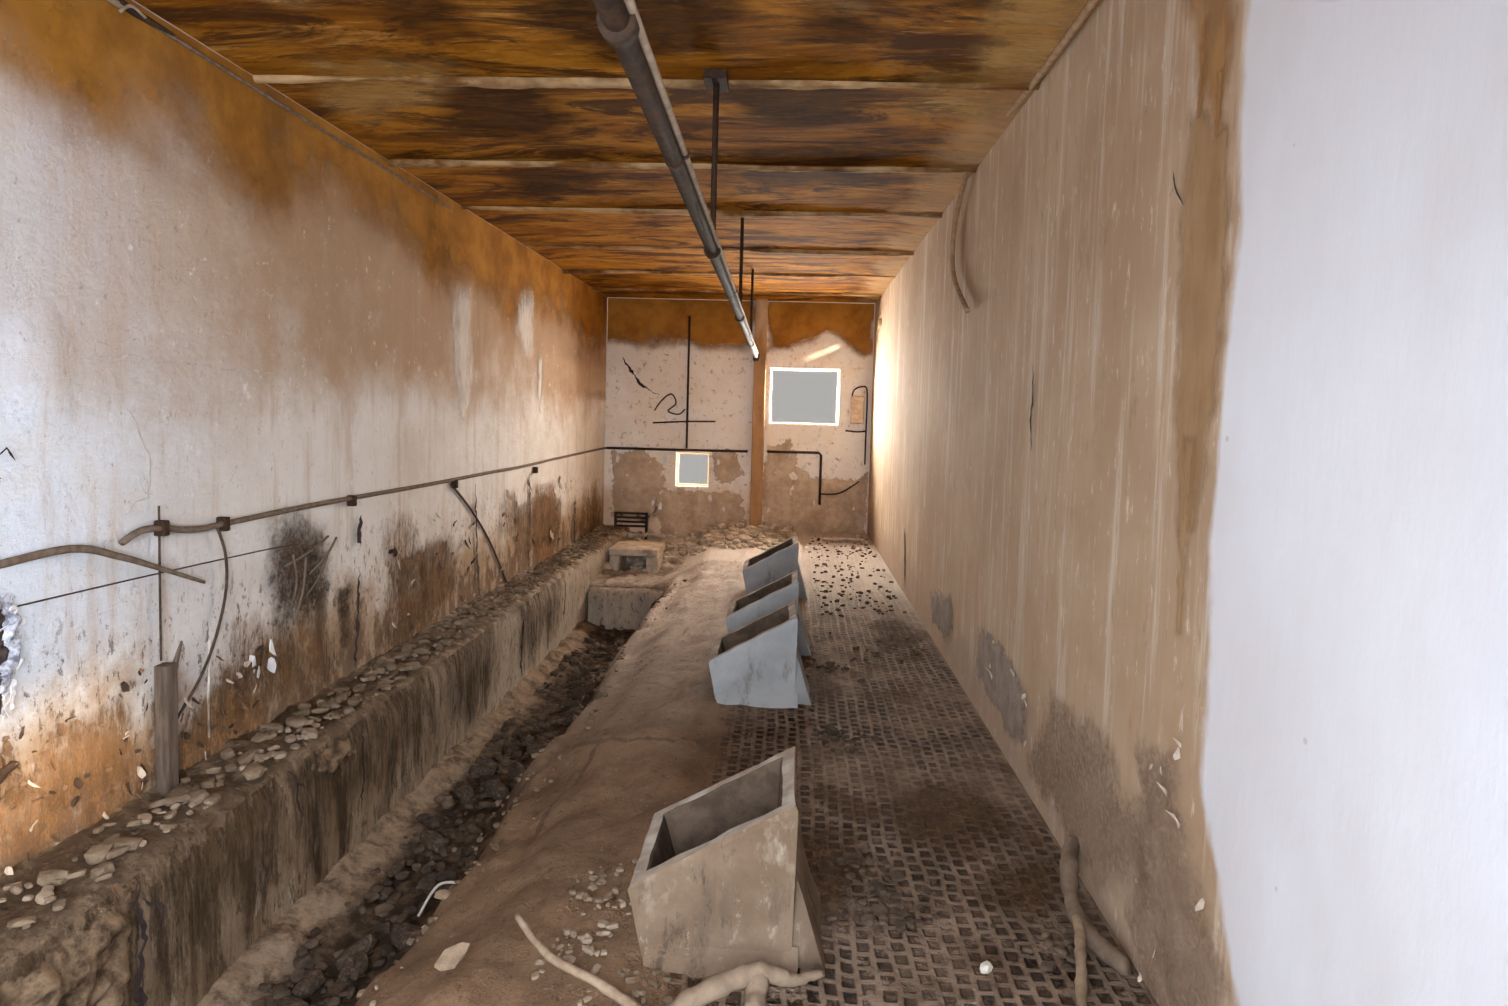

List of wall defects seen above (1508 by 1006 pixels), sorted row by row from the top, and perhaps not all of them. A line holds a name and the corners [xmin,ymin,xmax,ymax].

damp [918,0,1084,117]
damp [0,0,892,416]
damp [385,519,448,648]
peeling [4,833,60,875]
peeling [0,595,157,832]
damp [13,677,432,981]
damp [1033,700,1150,884]